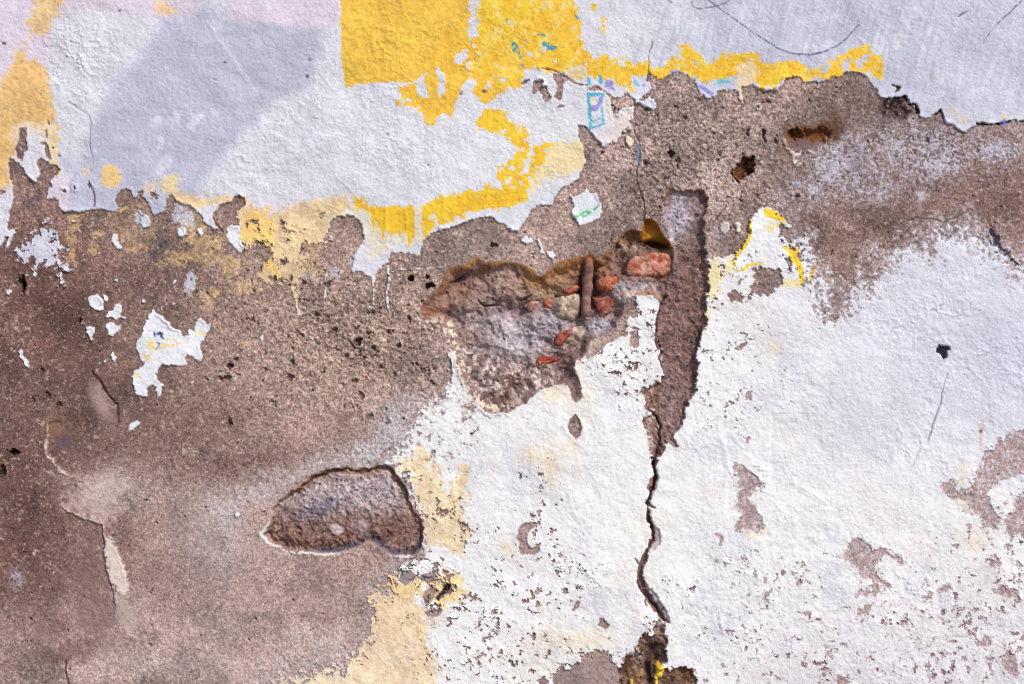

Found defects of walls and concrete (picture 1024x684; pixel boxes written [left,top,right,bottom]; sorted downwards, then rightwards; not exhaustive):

crack [634,41,654,222]
peeling [713,72,1024,295]
peeling [0,70,714,684]
spalling [727,257,793,304]
peeling [801,278,823,312]
peeling [822,298,854,325]
crack [635,458,670,622]
spalling [733,462,766,535]
spalling [785,649,861,684]
spalling [843,538,1024,684]
spalling [940,430,1024,614]